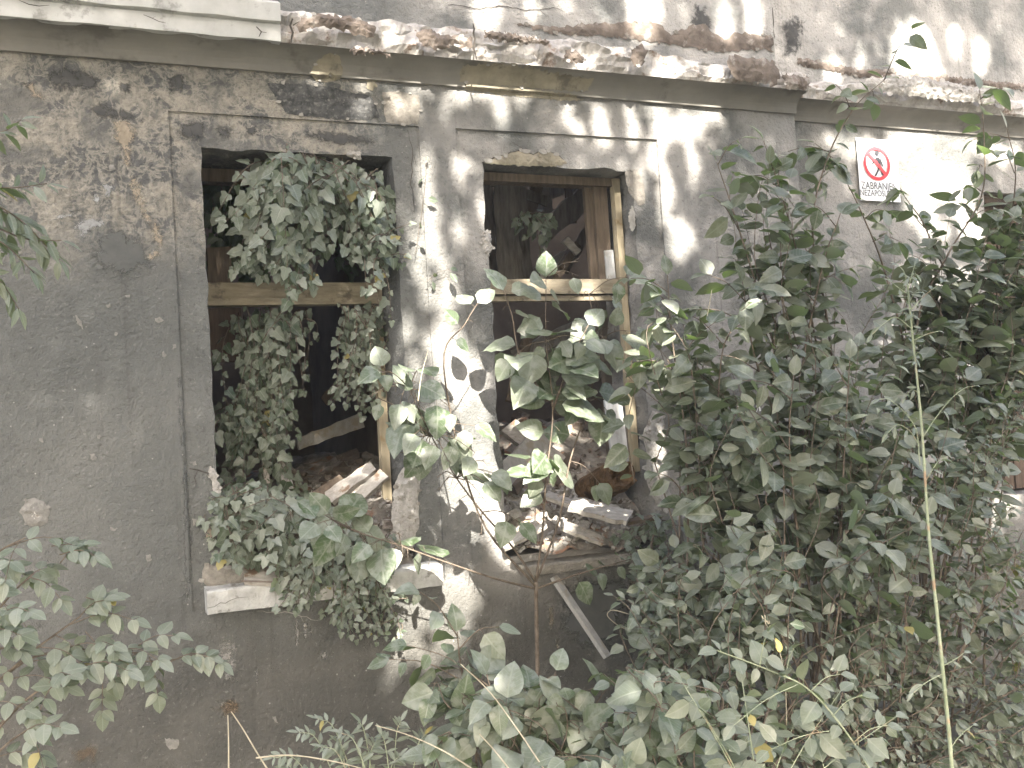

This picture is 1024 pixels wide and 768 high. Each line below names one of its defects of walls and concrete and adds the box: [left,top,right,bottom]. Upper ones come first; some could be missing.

flaking render [500,20,786,85]
leakage [47,67,99,92]
leakage [168,75,185,94]
flaking render [267,53,386,120]
peeling [459,49,594,101]
flaking render [797,58,1024,92]
leakage [91,103,143,121]
leakage [180,122,230,139]
leakage [307,130,374,145]
peeling [484,148,567,167]
leakage [56,214,151,275]